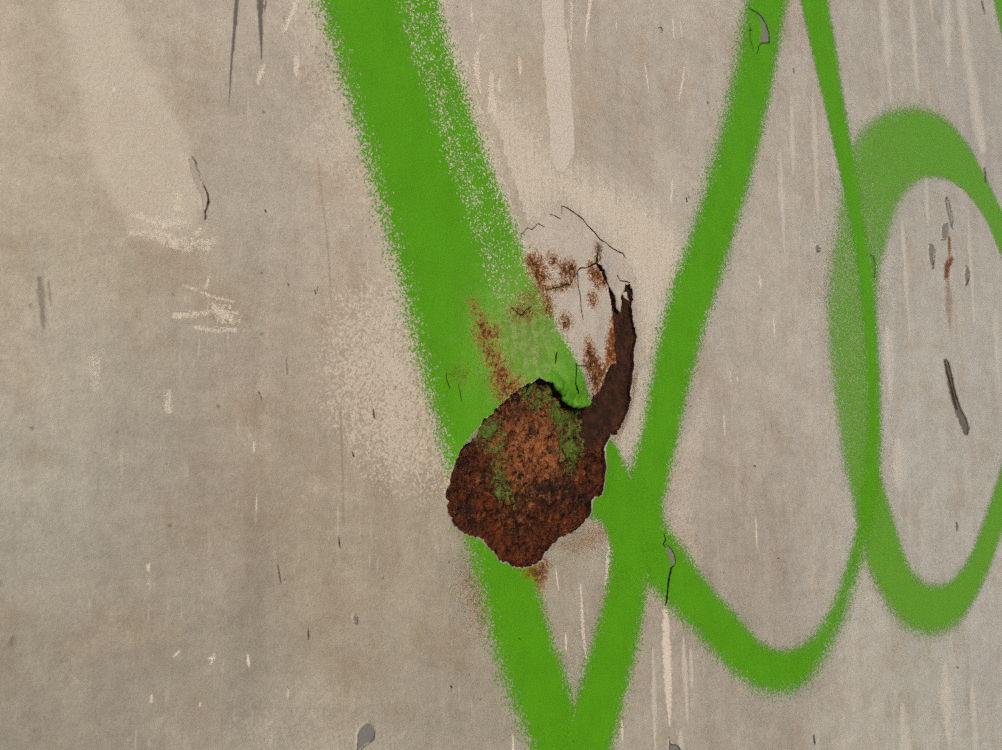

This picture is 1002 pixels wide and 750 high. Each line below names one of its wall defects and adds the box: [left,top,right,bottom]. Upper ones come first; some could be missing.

peeling [749,8,770,53]
peeling [42,0,212,257]
peeling [390,0,696,471]
crack [514,206,630,321]
rust [445,242,640,594]
spalling [944,359,970,435]
crack [663,533,673,606]
peeling [191,651,463,750]
peeling [667,737,682,750]